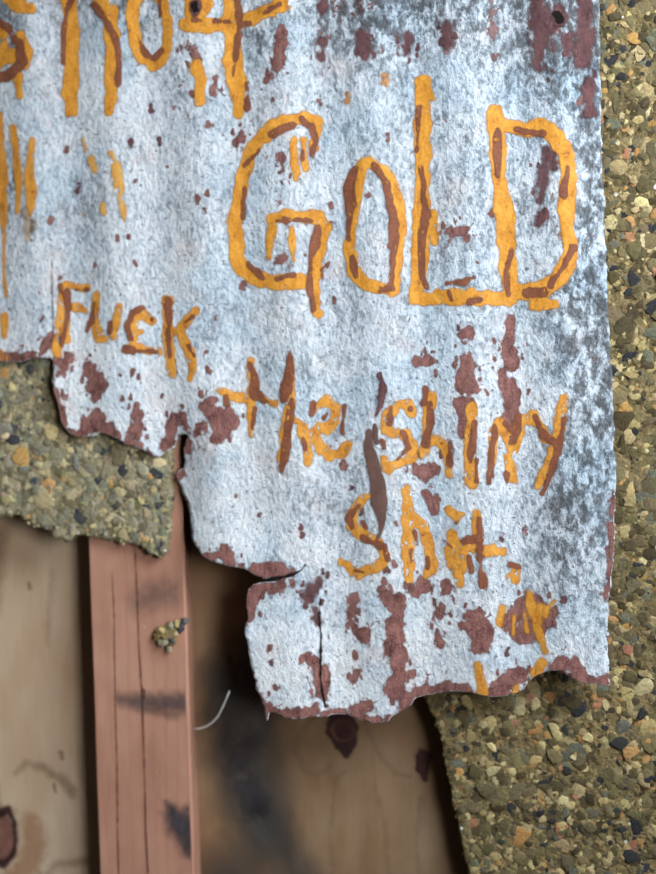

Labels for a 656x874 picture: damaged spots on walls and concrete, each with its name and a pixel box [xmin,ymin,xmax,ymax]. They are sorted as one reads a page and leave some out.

corrosion [526,0,597,118]
corrosion [0,331,149,449]
peeling [0,357,175,559]
corrosion [159,389,245,454]
corrosion [412,347,438,378]
corrosion [452,324,489,440]
corrosion [492,314,531,438]
peeling [153,618,189,653]
corrosion [203,543,330,626]
crack [263,564,306,581]
crack [318,599,327,708]
corrosion [258,560,568,723]